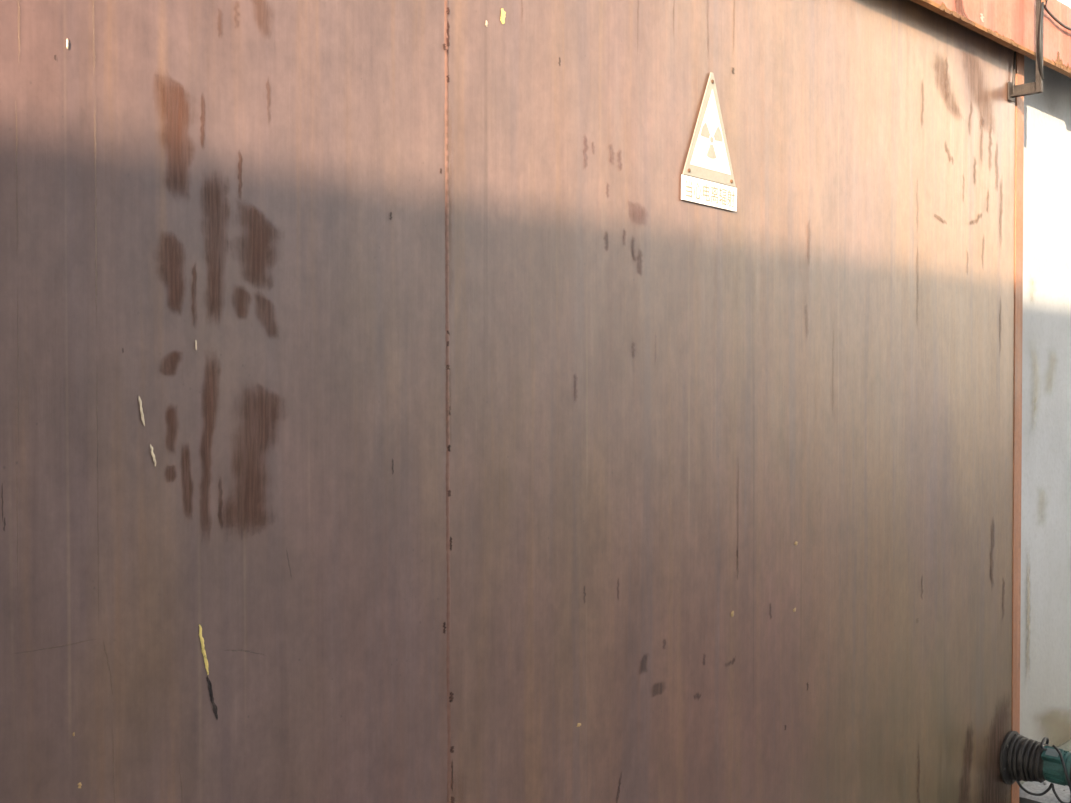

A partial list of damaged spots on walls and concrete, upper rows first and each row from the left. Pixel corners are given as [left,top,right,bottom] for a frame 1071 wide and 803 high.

corrosion [162,237,196,321]
corrosion [205,184,227,315]
corrosion [237,209,276,334]
corrosion [167,363,277,524]
peeling [199,625,209,675]